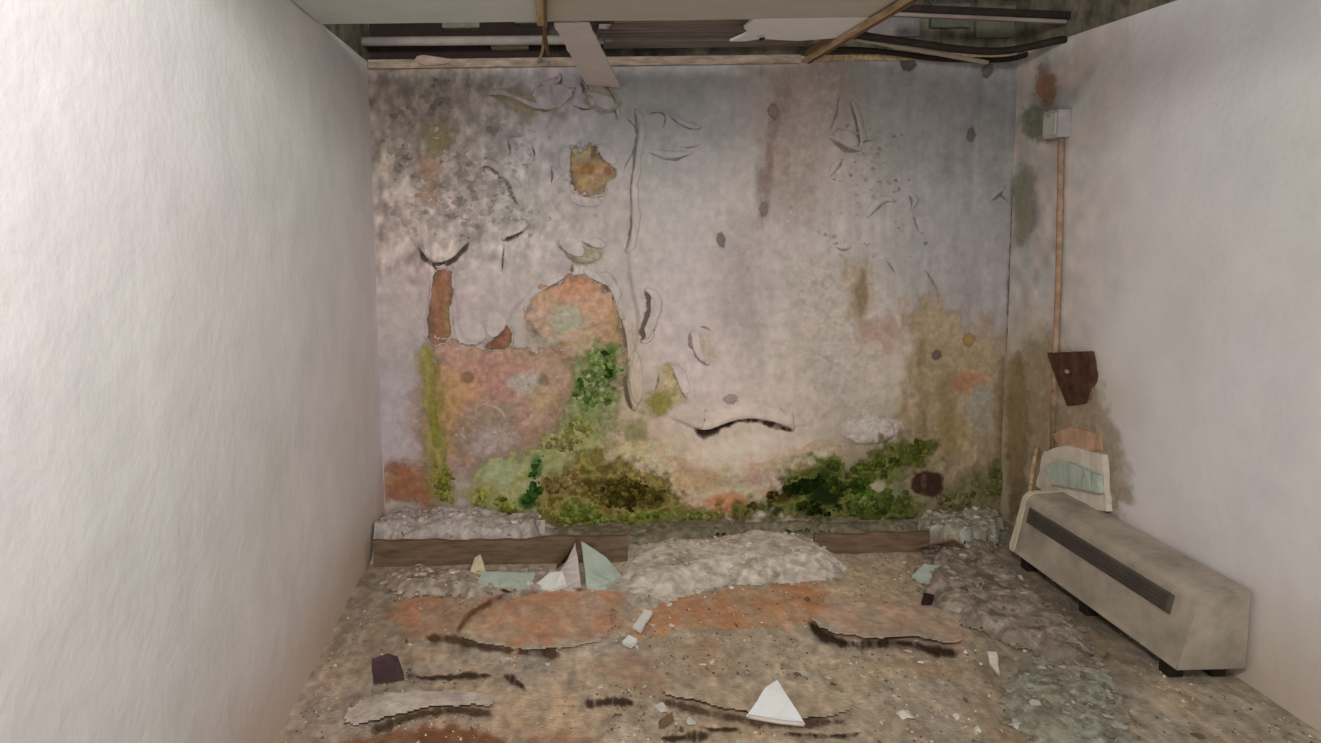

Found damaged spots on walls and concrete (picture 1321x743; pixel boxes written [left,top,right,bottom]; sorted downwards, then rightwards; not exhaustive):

crack [419,240,469,271]
flaking render [380,77,690,477]
crack [477,73,795,438]